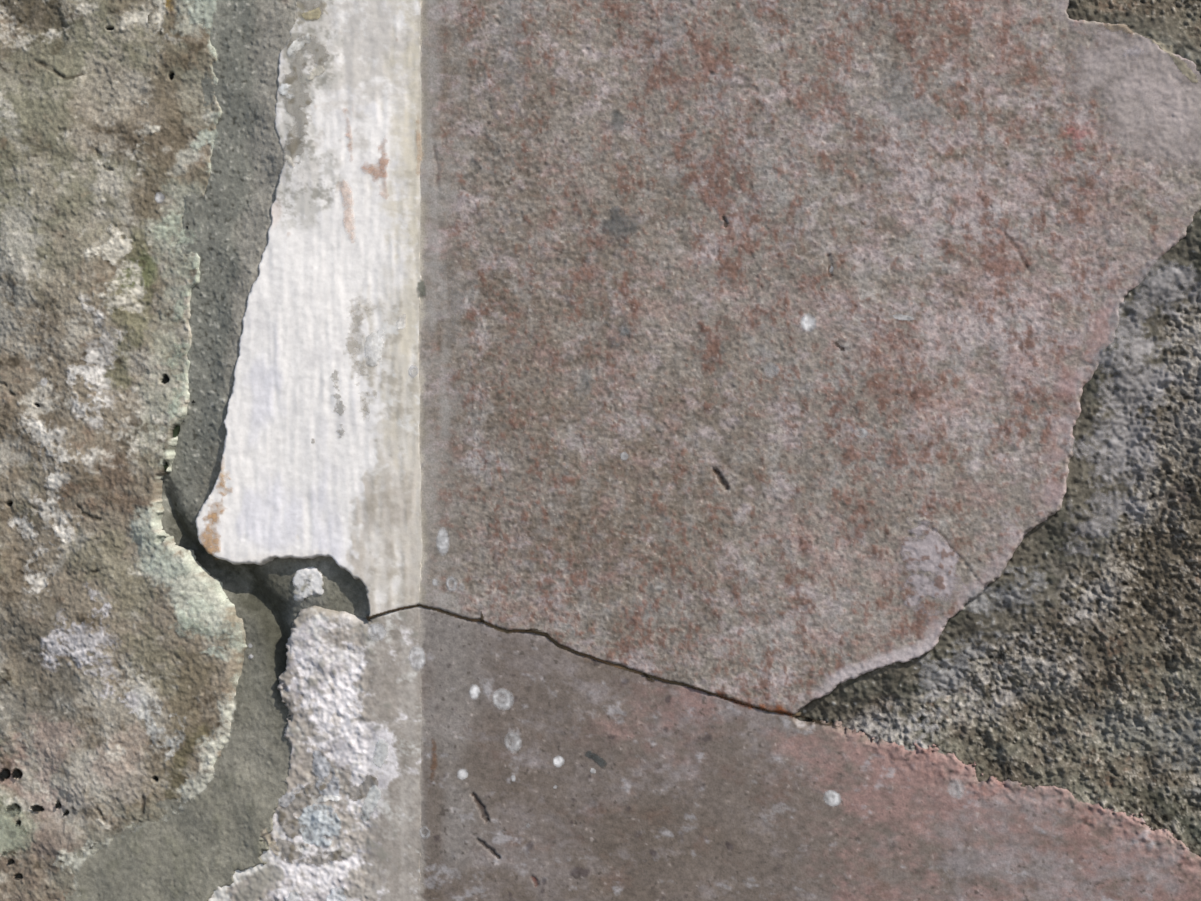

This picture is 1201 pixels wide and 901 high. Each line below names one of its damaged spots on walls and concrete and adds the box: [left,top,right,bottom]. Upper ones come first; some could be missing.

peeling [1066,0,1201,167]
peeling [348,310,406,372]
corrosion [202,483,224,555]
spalling [58,0,390,901]
spalling [794,210,1201,857]
crack [369,604,836,727]